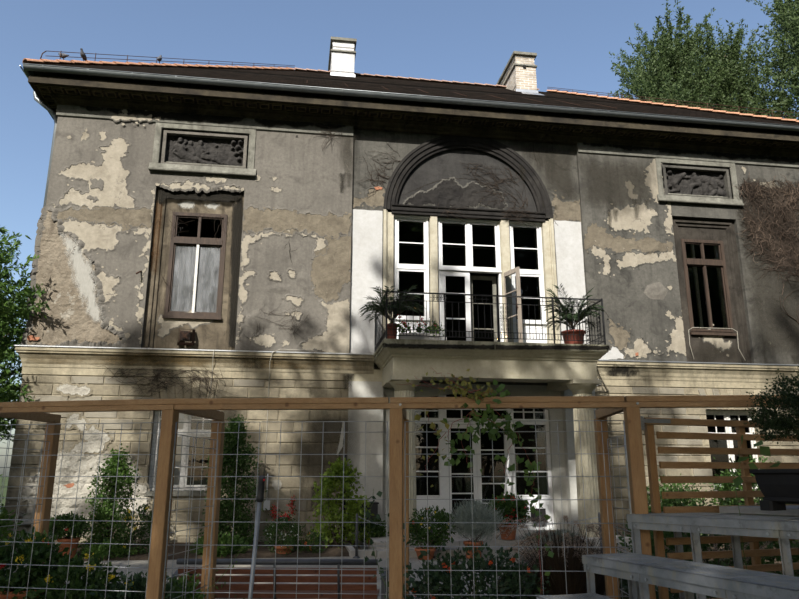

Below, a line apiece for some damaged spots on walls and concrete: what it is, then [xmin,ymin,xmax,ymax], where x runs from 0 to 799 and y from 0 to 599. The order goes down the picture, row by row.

flaking render [110,109,161,126]
flaking render [403,177,508,210]
flaking render [21,127,244,347]
flaking render [235,185,386,353]
flaking render [606,309,686,360]
spalling [54,382,92,398]
spalling [17,452,43,529]
spalling [50,412,151,530]